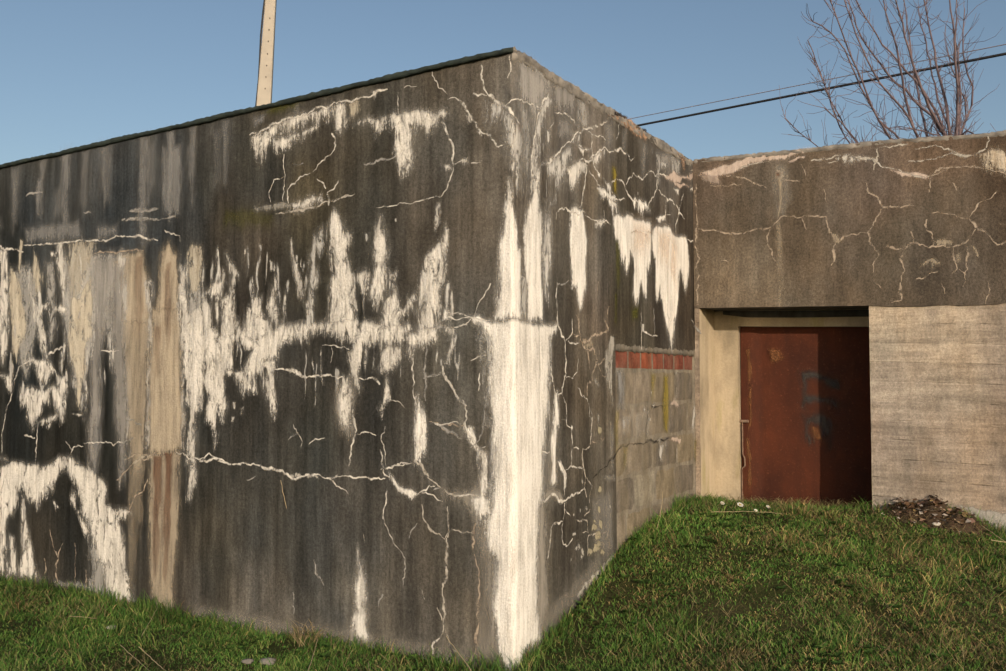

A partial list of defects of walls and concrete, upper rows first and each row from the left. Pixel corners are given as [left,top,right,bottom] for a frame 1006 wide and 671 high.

crack [0,208,179,254]
crack [269,133,353,203]
crack [363,156,396,166]
crack [379,127,477,208]
damp [613,215,693,349]
crack [432,56,1004,334]
damp [980,149,1006,176]
damp [0,63,632,671]
crack [542,280,677,557]
crack [117,345,490,668]